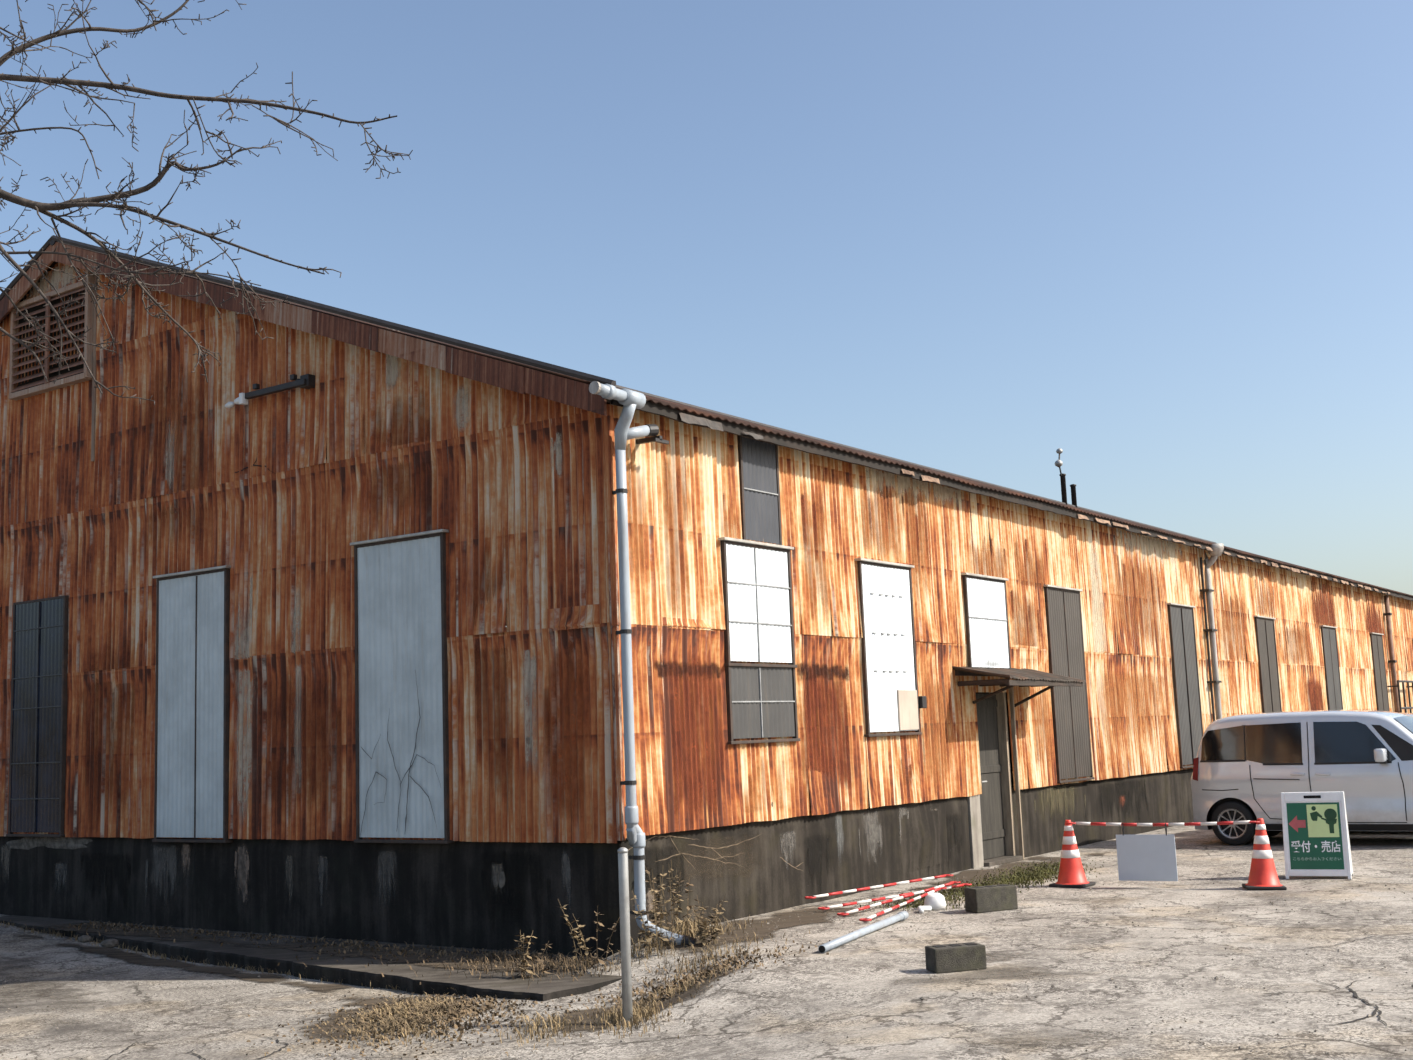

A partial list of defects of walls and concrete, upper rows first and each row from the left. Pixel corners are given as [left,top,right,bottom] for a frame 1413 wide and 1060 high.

corrosion [670,524,680,596]
corrosion [801,495,825,571]
corrosion [853,487,929,572]
corrosion [971,537,1040,647]
corrosion [1106,556,1161,635]
corrosion [1279,584,1336,660]
corrosion [1363,600,1383,634]
corrosion [798,664,851,785]
corrosion [1305,676,1323,710]
damp [56,844,190,913]
damp [482,853,571,917]